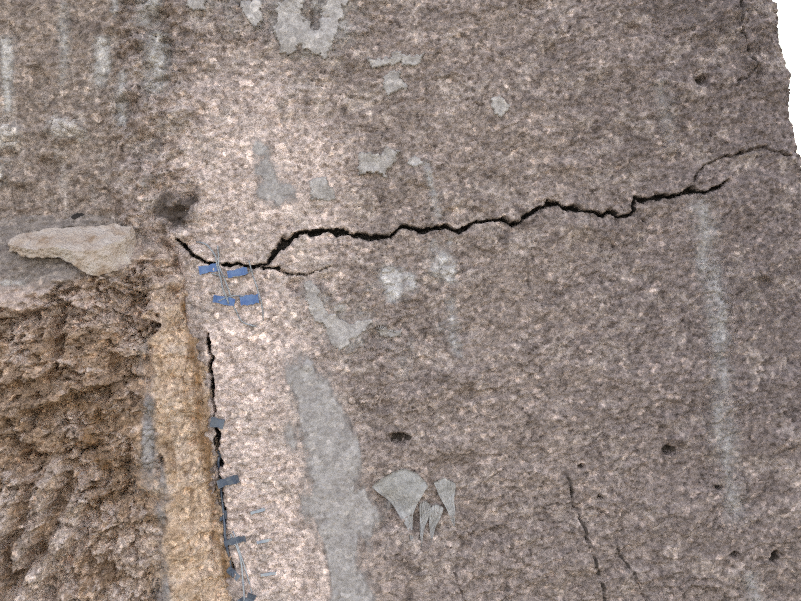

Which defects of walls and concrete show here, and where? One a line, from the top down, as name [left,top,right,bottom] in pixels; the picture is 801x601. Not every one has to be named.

crack [175,167,729,275]